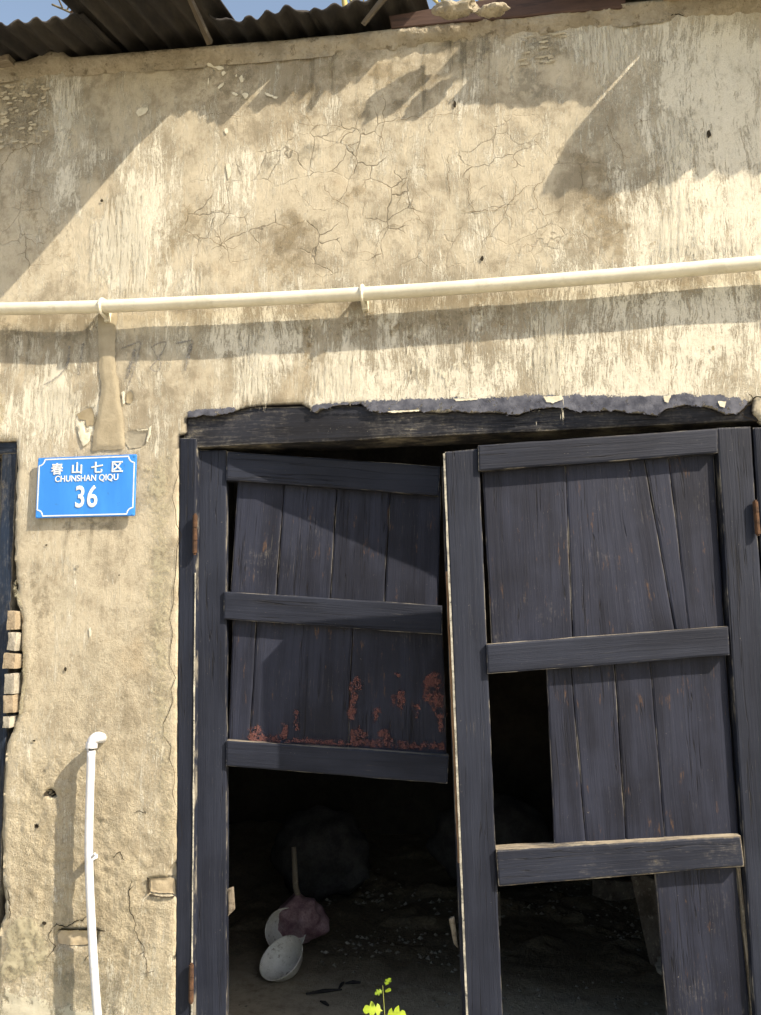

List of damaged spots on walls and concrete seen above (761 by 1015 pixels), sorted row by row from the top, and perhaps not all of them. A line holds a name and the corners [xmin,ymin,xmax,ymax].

crack [296,98,567,271]
peeling [187,407,236,417]
peeling [312,392,749,416]
spalling [2,583,27,728]
crack [114,852,154,982]